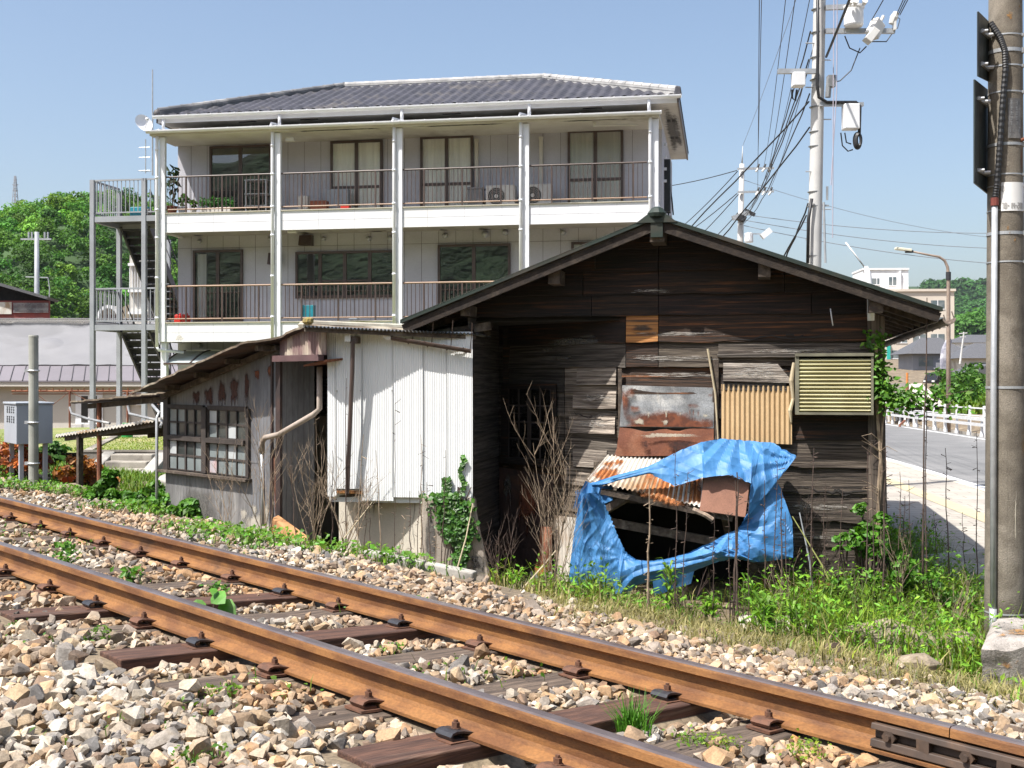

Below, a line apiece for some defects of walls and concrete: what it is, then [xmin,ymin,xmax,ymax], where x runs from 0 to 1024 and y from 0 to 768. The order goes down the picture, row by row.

leakage [666,112,681,148]
rust [622,388,713,427]
rust [668,441,692,450]
rust [595,459,624,480]
rust [636,474,702,505]